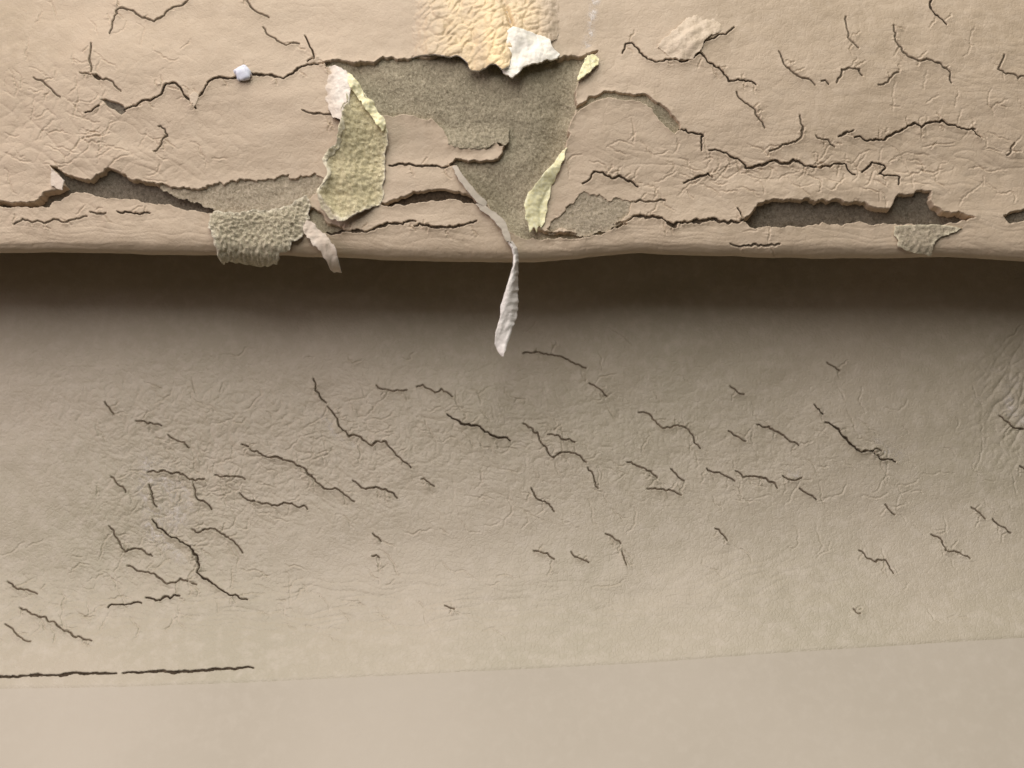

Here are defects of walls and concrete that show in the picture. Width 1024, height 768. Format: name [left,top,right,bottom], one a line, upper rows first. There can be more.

crack [80,0,330,113]
peeling [658,14,722,61]
crack [622,27,981,185]
crack [779,16,952,86]
peeling [35,0,634,357]
crack [582,171,780,247]
peeling [744,192,962,256]
crack [313,379,434,487]
crack [377,384,599,489]
crack [627,412,817,500]
crack [108,444,398,608]
crack [5,581,92,642]